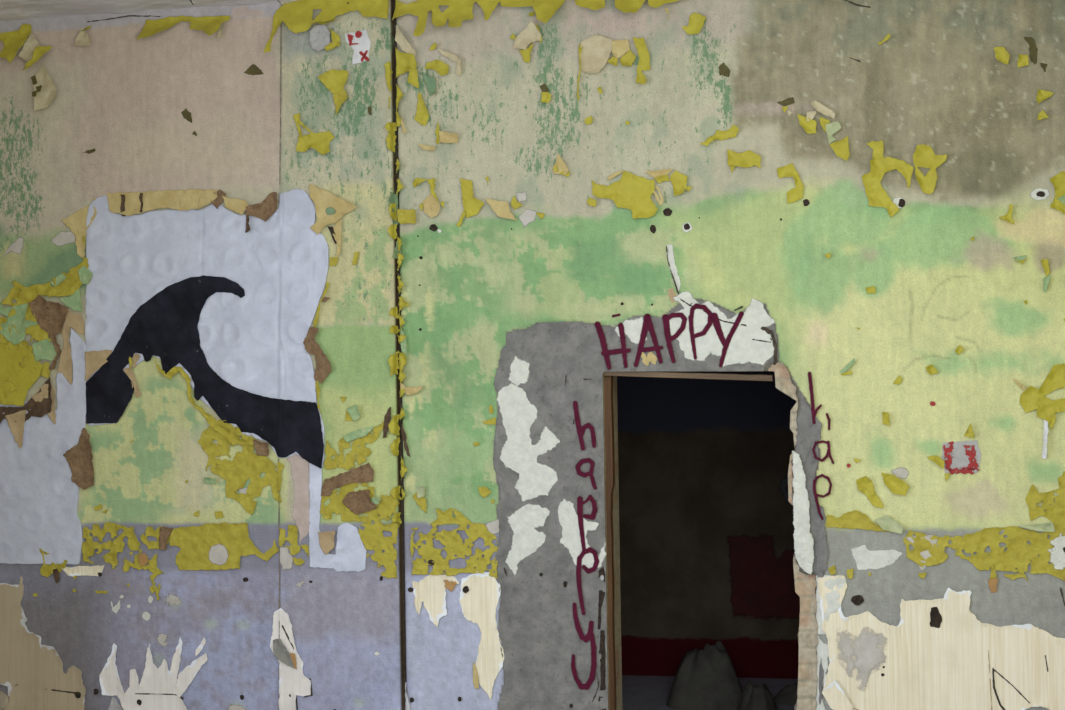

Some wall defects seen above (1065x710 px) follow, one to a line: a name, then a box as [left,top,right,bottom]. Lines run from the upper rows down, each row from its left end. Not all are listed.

peeling [994,47,1029,68]
peeling [1036,89,1053,120]
peeling [862,140,947,217]
peeling [1030,171,1065,214]
peeling [999,204,1014,224]
peeling [1041,259,1050,292]
flaking render [0,0,836,710]
peeling [839,358,855,376]
peeling [1012,363,1065,459]
peeling [927,455,950,482]
peeling [826,468,1065,581]